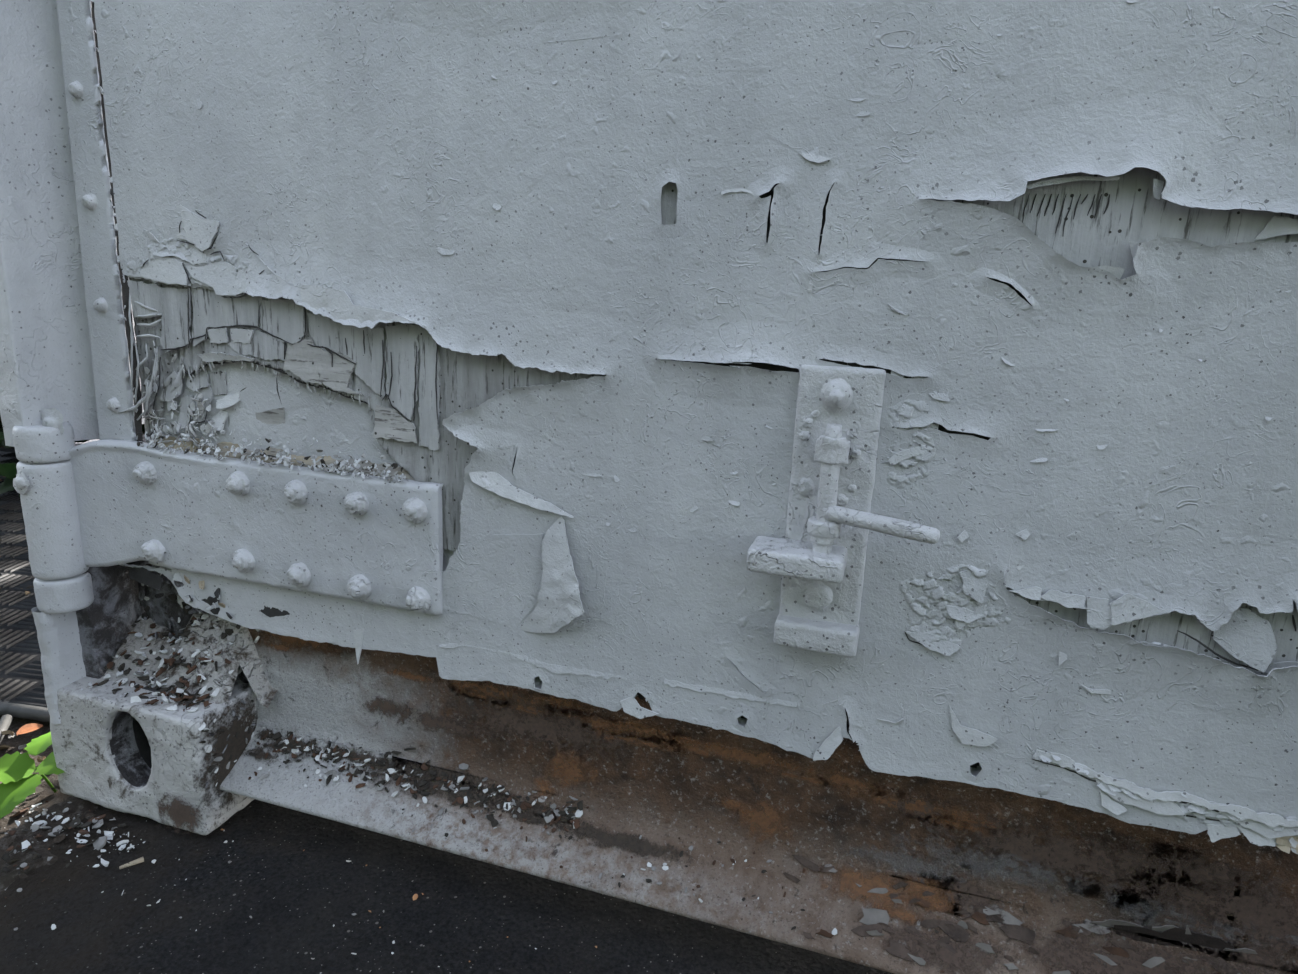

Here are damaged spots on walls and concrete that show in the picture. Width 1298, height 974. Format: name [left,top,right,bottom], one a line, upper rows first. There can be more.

peeling [126,236,248,290]
peeling [648,168,691,238]
crack [744,166,1041,321]
peeling [863,93,1298,340]
crack [642,320,1015,461]
peeling [438,471,584,638]
corrosion [118,649,234,708]
corrosion [264,631,336,653]
peeling [899,527,1298,726]
corrosion [158,792,202,833]
corrosion [362,680,1298,974]
peeling [1032,750,1298,854]